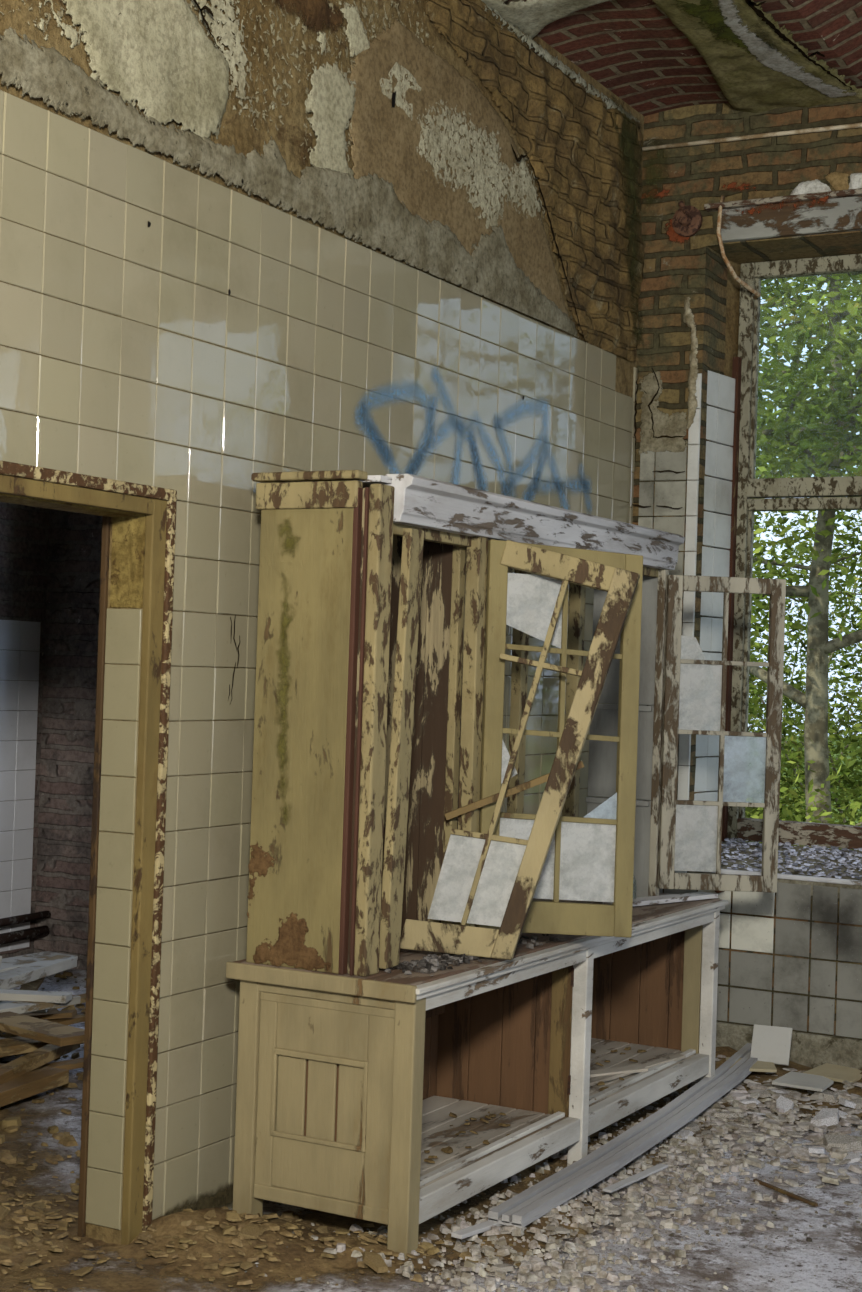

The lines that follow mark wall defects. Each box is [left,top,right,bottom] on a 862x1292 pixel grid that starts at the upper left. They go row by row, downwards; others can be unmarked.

crack [193,0,221,49]
peeling [718,0,857,98]
crack [745,0,855,91]
peeling [0,0,645,363]
peeling [790,172,862,195]
flaking render [638,297,698,455]